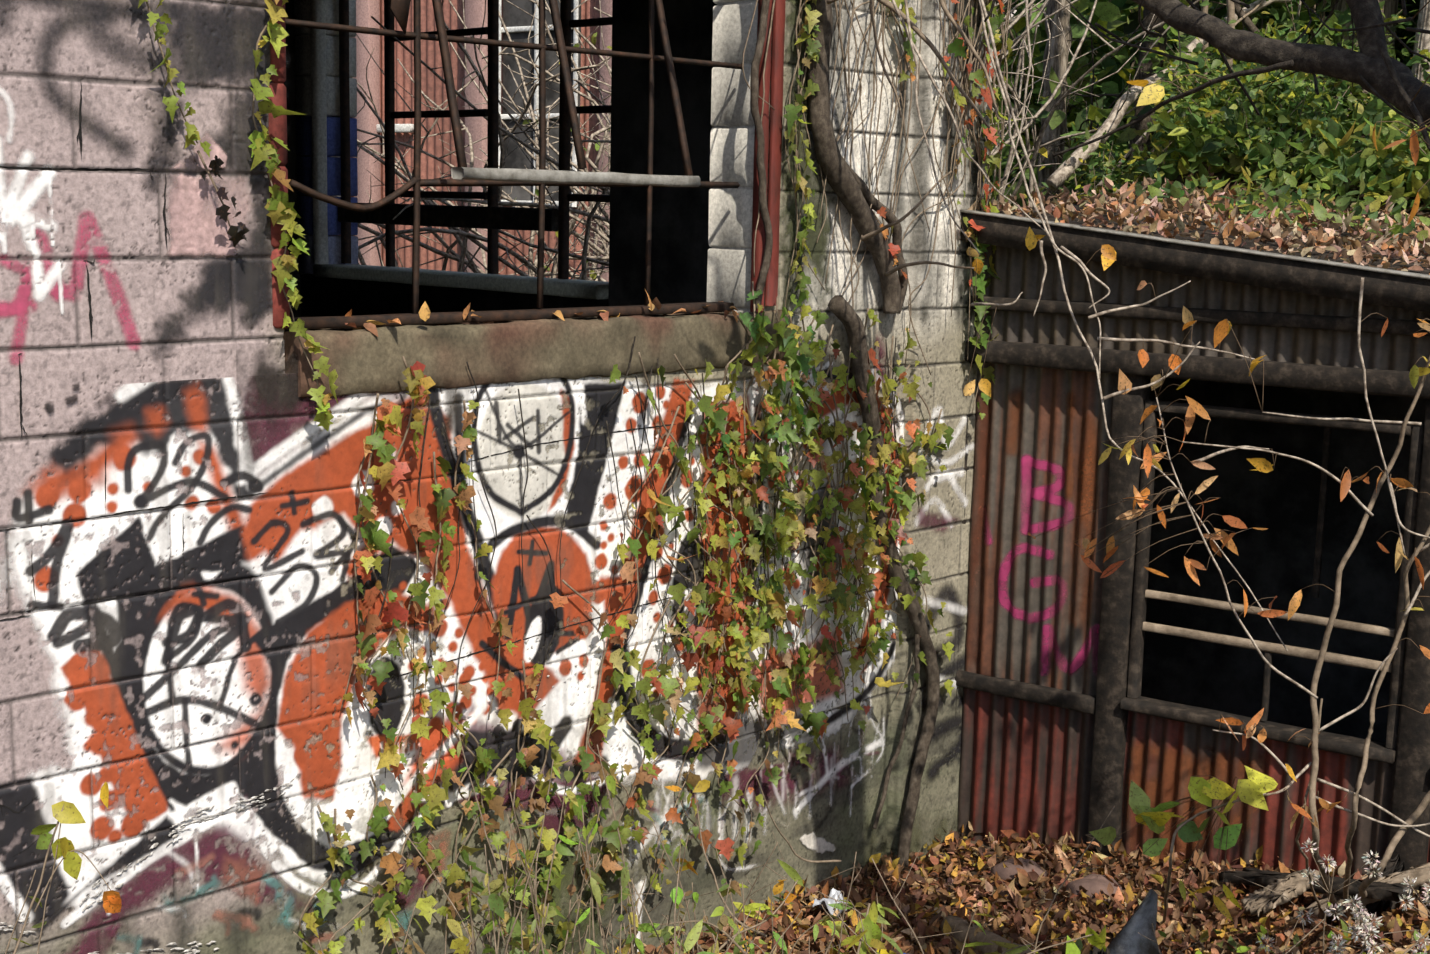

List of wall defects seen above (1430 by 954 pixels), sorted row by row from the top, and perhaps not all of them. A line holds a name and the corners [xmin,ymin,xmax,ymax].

leakage [781,0,834,309]
leakage [889,60,928,265]
leakage [923,0,993,211]
leakage [954,241,976,320]
corrosion [969,392,990,612]
corrosion [1006,392,1021,452]
corrosion [1065,393,1097,542]
corrosion [1128,744,1264,869]